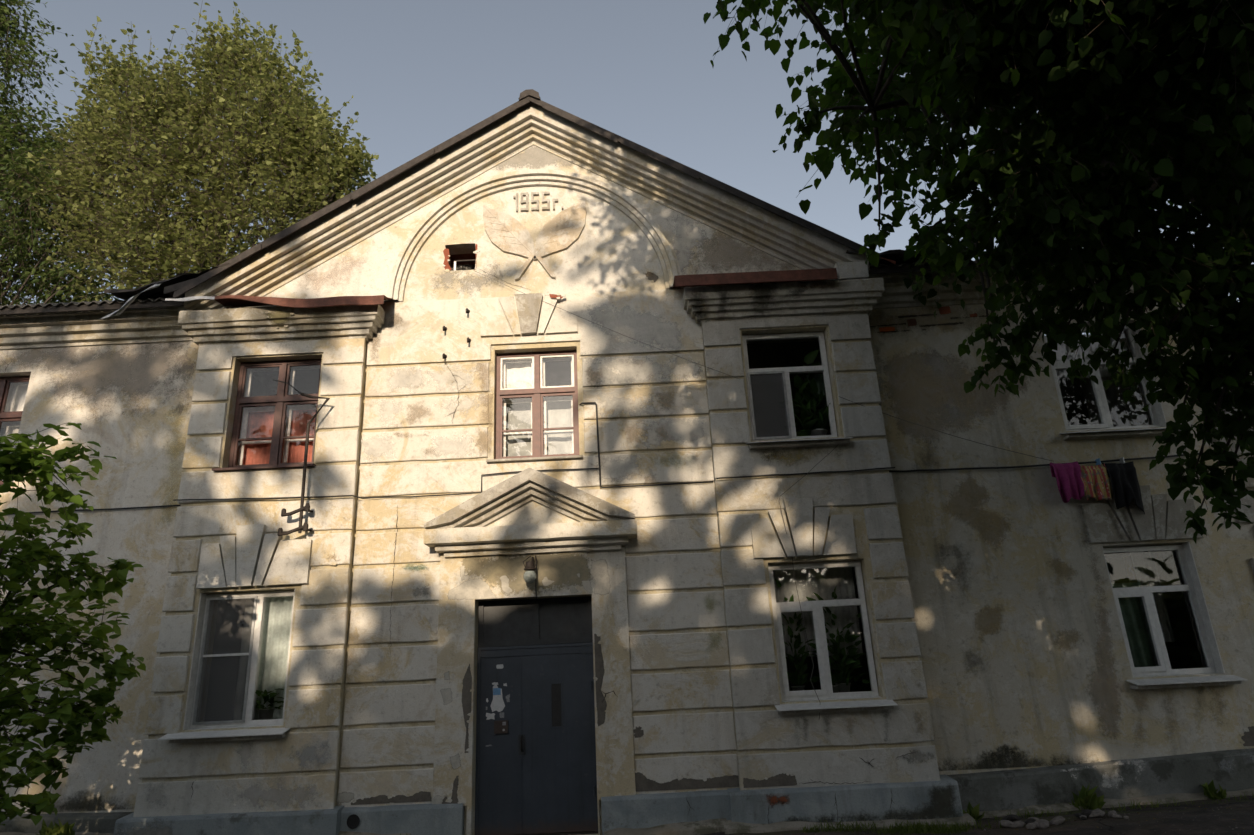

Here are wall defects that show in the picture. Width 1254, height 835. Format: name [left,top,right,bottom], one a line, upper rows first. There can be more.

spalling [593,633,607,726]
spalling [351,664,474,805]
spalling [635,771,797,792]
spalling [1239,726,1254,760]